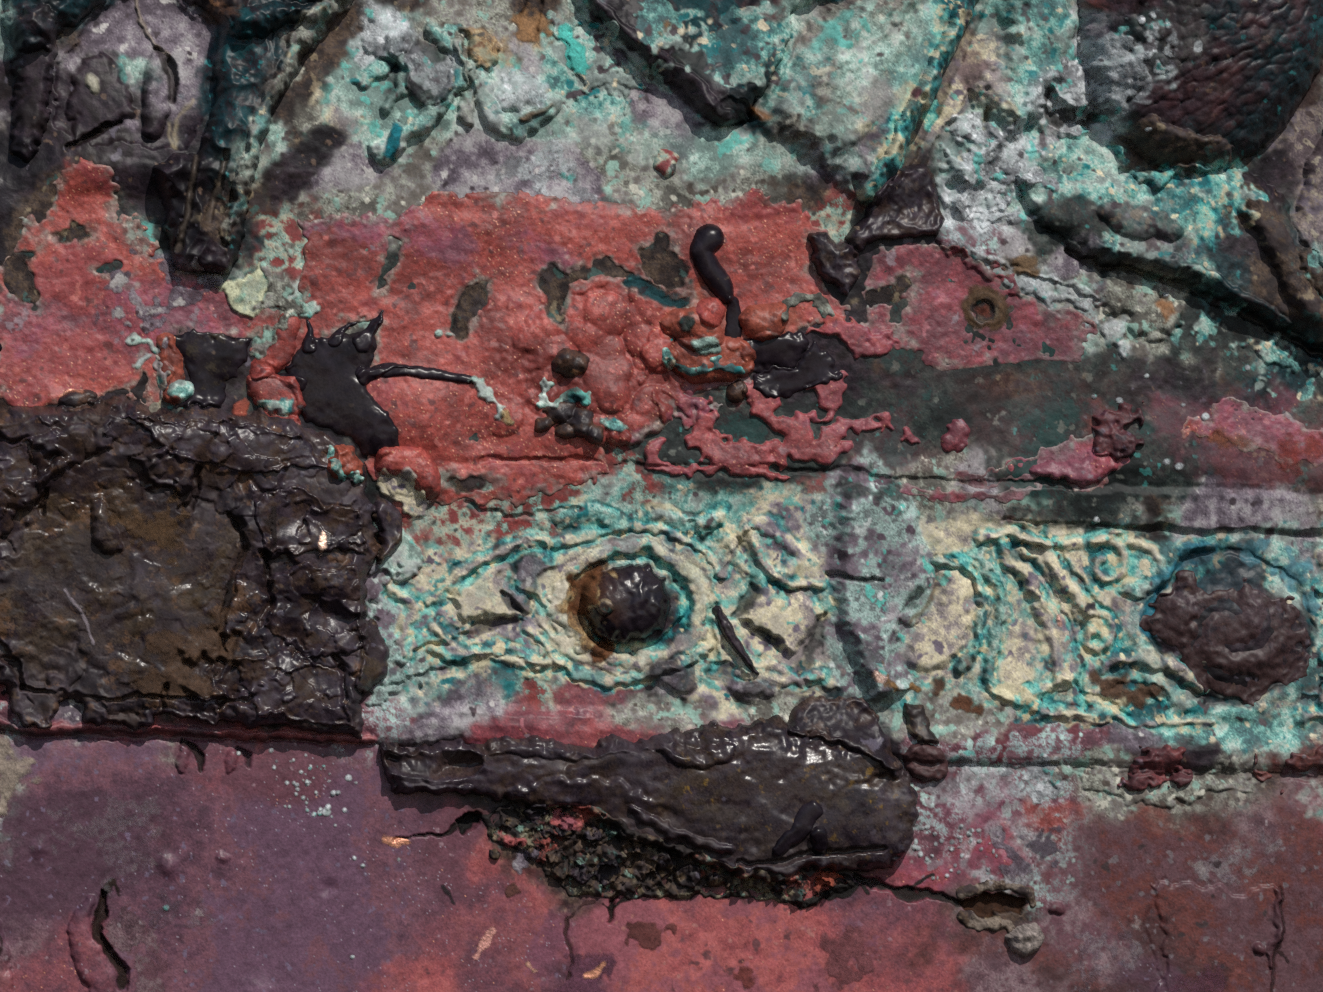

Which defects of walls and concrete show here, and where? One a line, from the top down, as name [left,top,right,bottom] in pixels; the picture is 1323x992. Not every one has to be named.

peeling [0,157,280,408]
peeling [282,187,1098,508]
rust [962,285,1008,330]
peeling [1067,458,1130,492]
peeling [1180,397,1323,473]
rust [558,560,616,663]
crack [399,821,459,839]
crack [92,878,128,989]
crack [1271,889,1289,992]